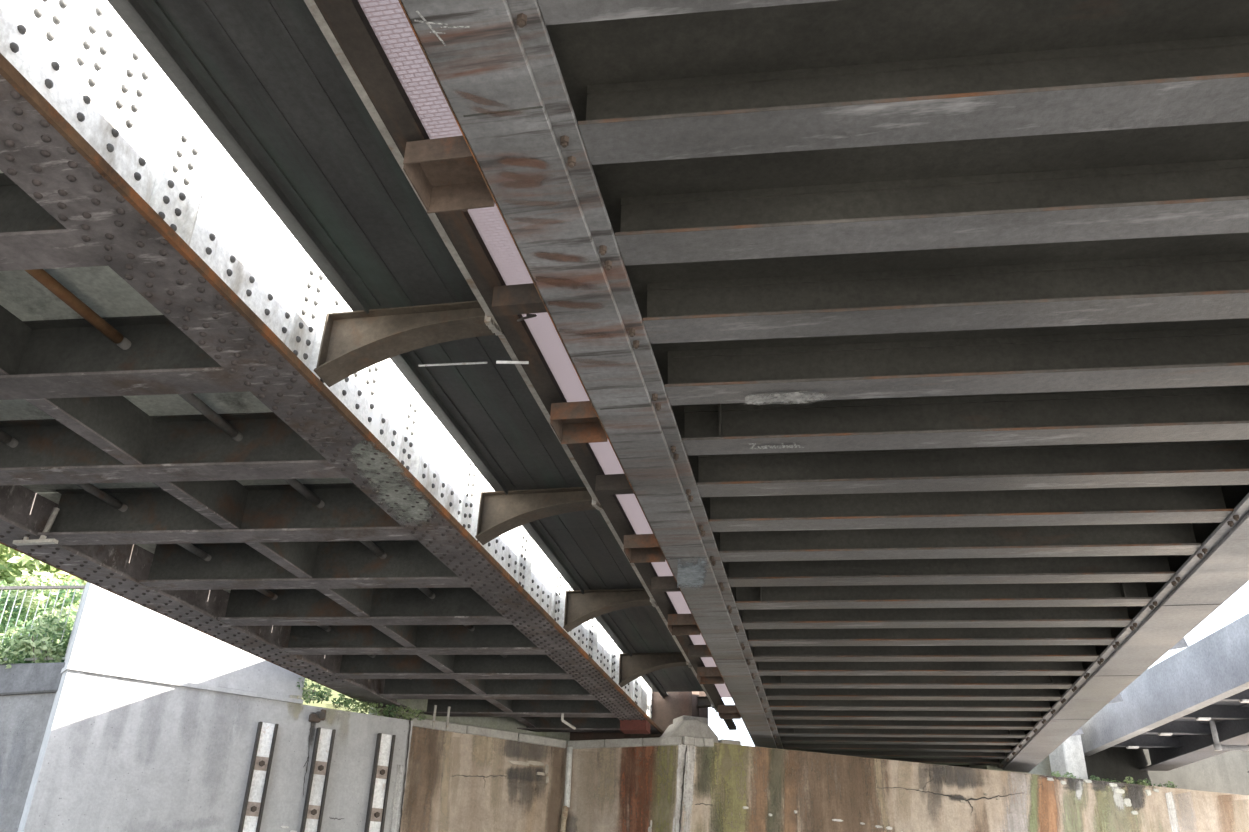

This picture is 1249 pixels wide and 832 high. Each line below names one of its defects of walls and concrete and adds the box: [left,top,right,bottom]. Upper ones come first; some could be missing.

corrosion [398,0,773,832]
leakage [472,735,563,832]
crack [884,779,1021,813]
leakage [925,765,982,794]
corrosion [1037,776,1060,832]